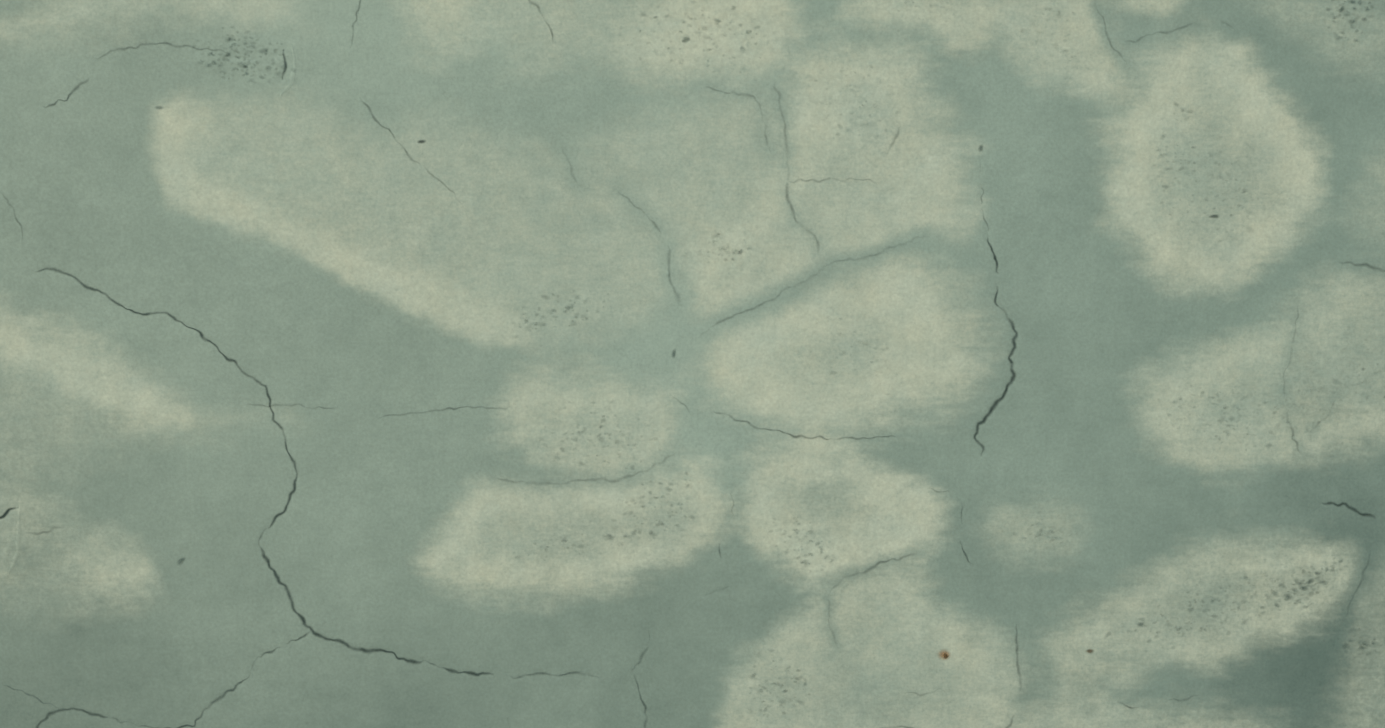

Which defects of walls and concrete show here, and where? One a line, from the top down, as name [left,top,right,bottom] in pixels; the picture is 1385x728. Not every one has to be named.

crack [86,286,236,362]
crack [266,388,296,521]
water stain [138,0,818,628]
crack [974,242,1015,438]
water stain [659,0,1385,728]
crack [263,555,483,675]